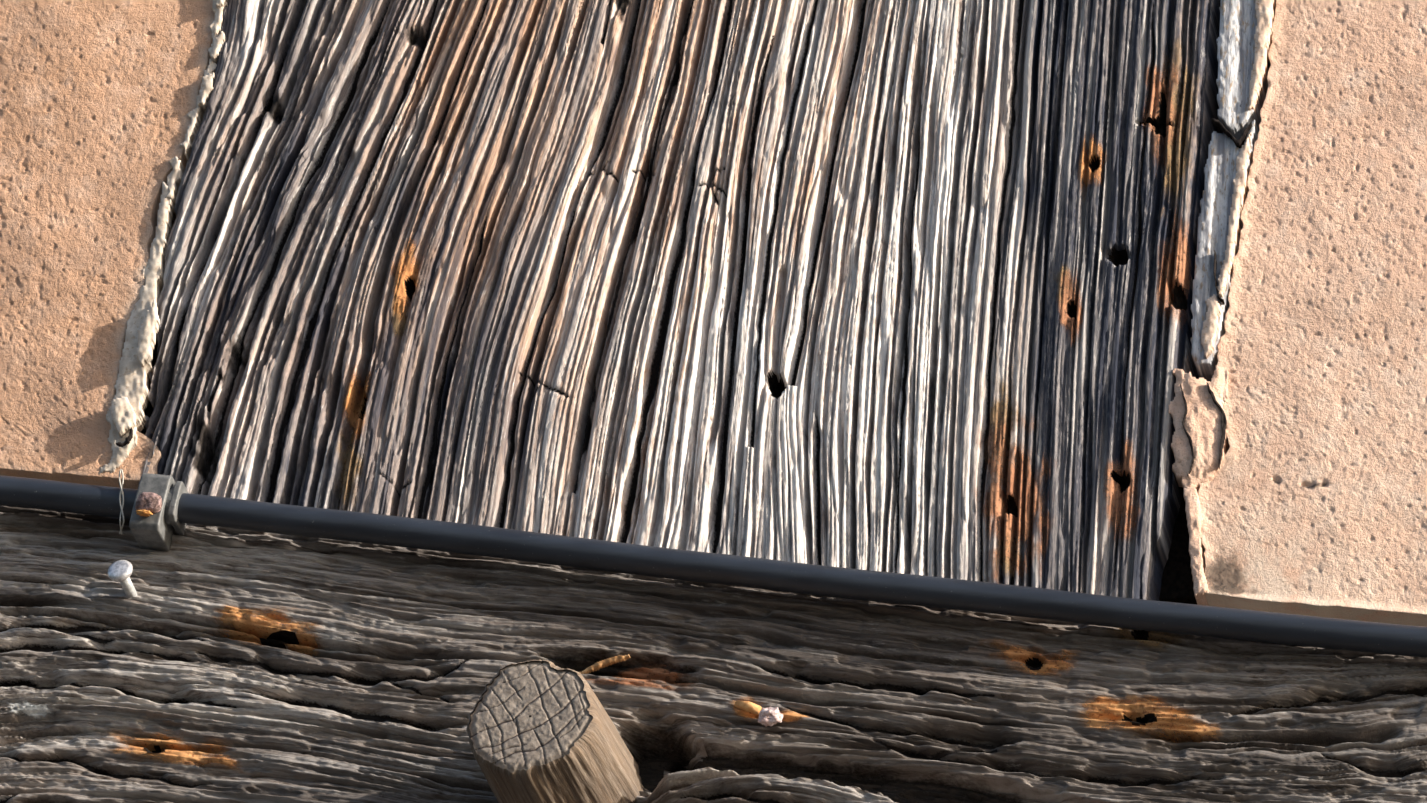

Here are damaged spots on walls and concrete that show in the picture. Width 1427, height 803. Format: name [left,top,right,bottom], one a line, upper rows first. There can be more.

peeling [1247,0,1275,114]
rust [1079,140,1104,191]
flaking render [99,0,229,474]
rust [1057,269,1083,343]
flaking render [1168,132,1252,493]
rust [984,383,1049,577]
rust [1105,443,1138,539]
rust [220,606,318,656]
rust [587,667,688,689]
rust [994,644,1072,674]
rust [114,733,237,767]
rust [1085,697,1219,743]